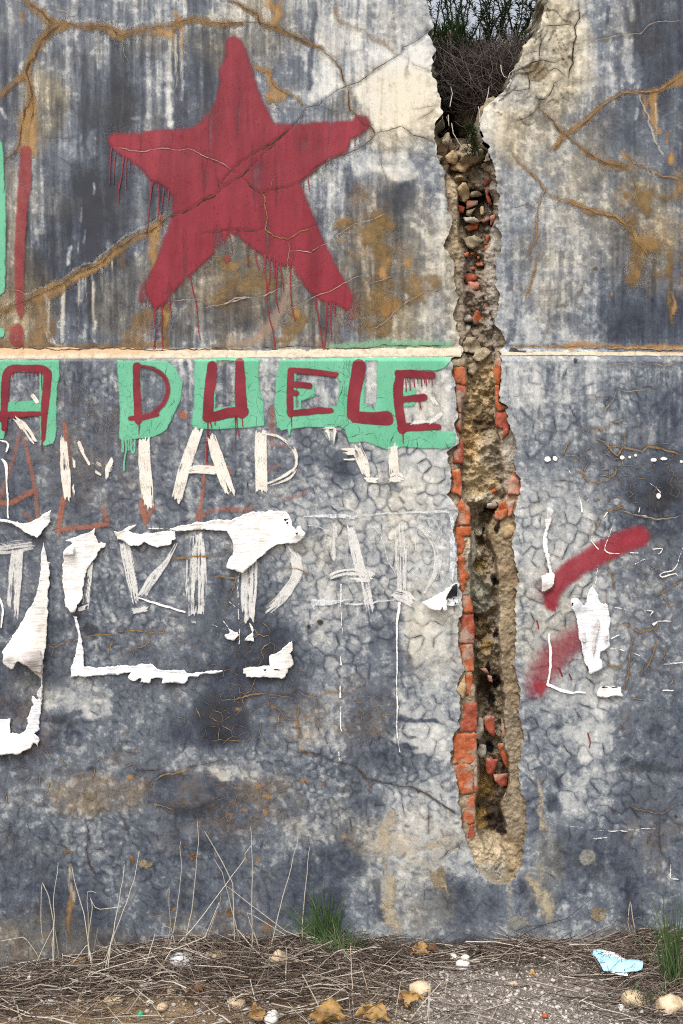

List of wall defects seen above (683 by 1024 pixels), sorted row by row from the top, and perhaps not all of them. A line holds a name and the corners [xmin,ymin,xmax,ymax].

crack [0,1,433,312]
crack [506,5,683,294]
corrosion [571,187,676,323]
crack [0,287,556,930]
spalling [434,138,528,885]
crack [506,283,683,920]
flaking render [428,867,450,896]